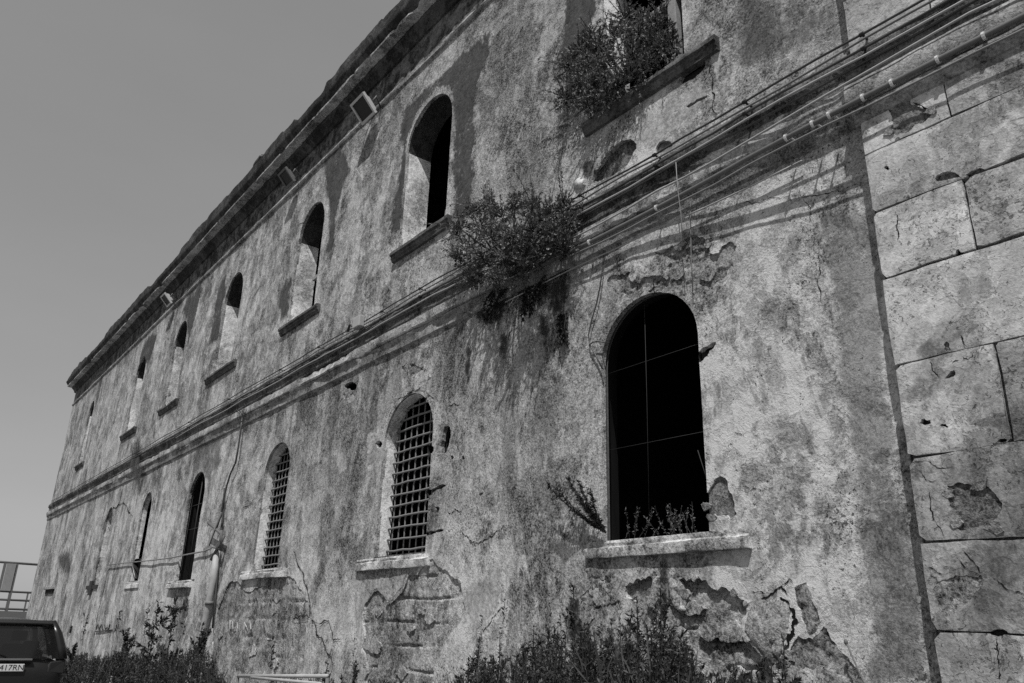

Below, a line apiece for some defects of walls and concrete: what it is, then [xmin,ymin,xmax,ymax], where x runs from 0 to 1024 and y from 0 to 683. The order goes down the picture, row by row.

peeling [608,235,737,301]
water stain [474,269,570,366]
peeling [701,476,737,521]
peeling [932,479,1004,535]
water stain [58,551,70,572]
spalling [629,577,652,600]
water stain [660,560,668,618]
spalling [353,559,503,683]
spalling [681,575,863,683]